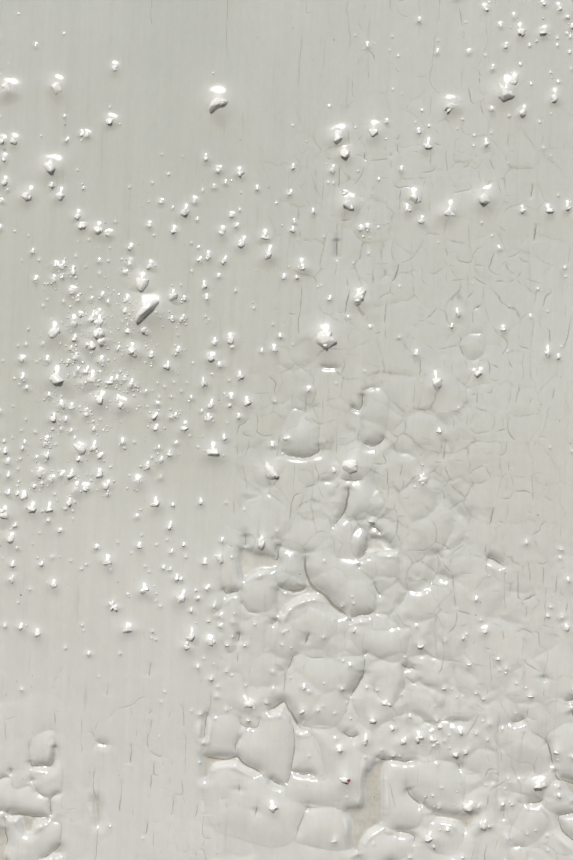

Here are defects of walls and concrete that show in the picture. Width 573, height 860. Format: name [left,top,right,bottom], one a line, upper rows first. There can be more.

crack [288,560,370,615]
crack [210,745,280,785]